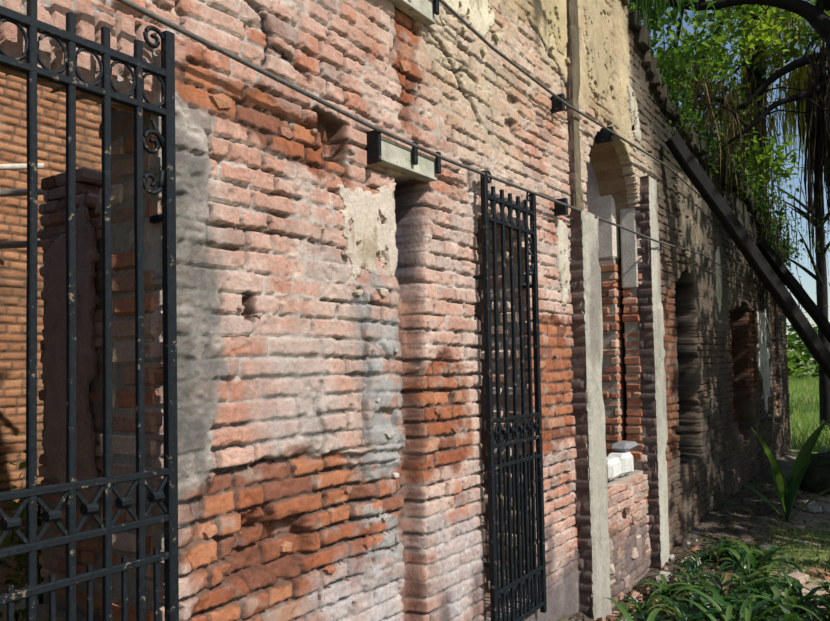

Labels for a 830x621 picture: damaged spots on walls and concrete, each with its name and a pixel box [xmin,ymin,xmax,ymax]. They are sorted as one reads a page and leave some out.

crack [250,6,305,76]
spalling [393,6,418,127]
peeling [441,0,501,55]
peeling [540,0,570,64]
peeling [583,0,615,117]
peeling [627,81,642,152]
spalling [175,52,398,296]
spalling [237,297,263,320]
spalling [184,352,471,621]